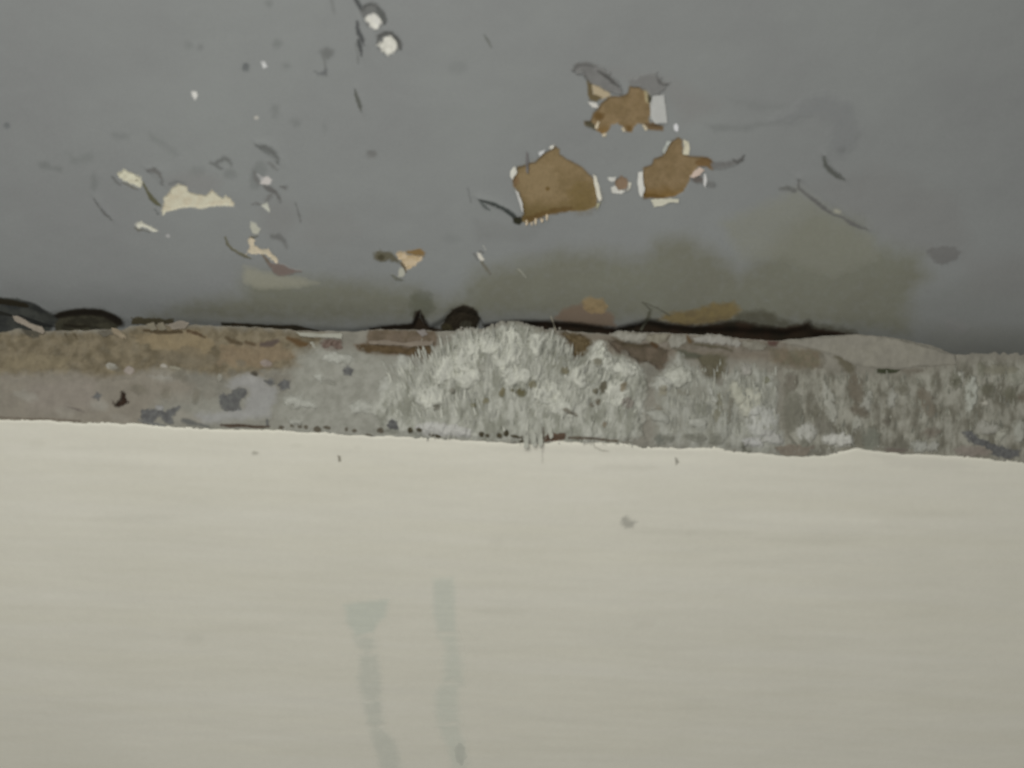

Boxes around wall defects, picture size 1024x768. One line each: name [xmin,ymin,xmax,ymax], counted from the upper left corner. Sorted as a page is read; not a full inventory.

spalling [359,0,404,59]
peeling [510,59,746,226]
spalling [110,168,236,239]
spalling [371,247,427,282]
spalling [0,316,439,410]
leakage [138,181,1024,464]
peeling [559,330,827,372]
spalling [277,424,331,433]
spalling [478,429,524,443]
spalling [772,435,826,456]
leakage [340,596,406,768]
leakage [428,574,473,768]